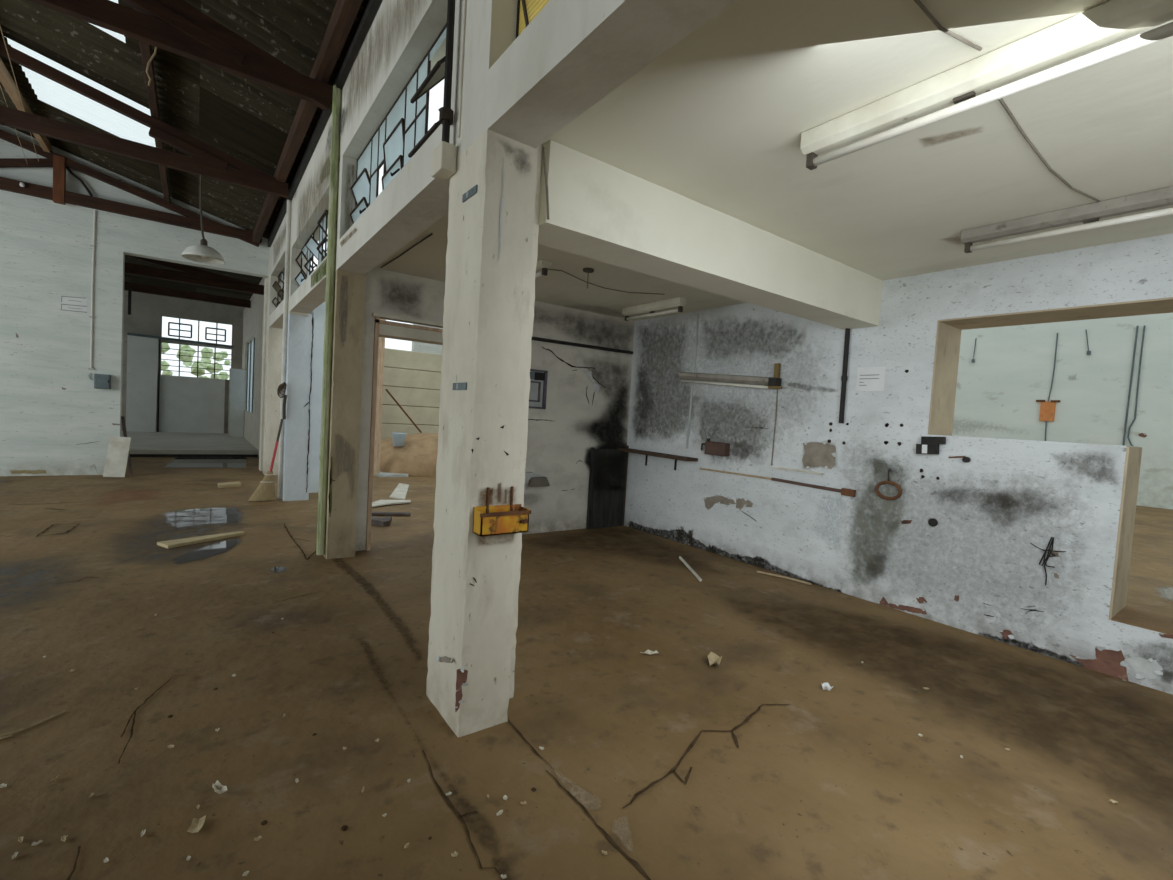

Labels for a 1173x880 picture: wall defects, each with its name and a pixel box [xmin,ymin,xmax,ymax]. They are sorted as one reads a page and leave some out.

damp [854,462,900,581]
crack [118,674,189,764]
spalling [436,655,469,712]
crack [422,750,506,880]
crack [508,720,651,880]
crack [623,704,791,808]
spalling [1069,646,1163,681]